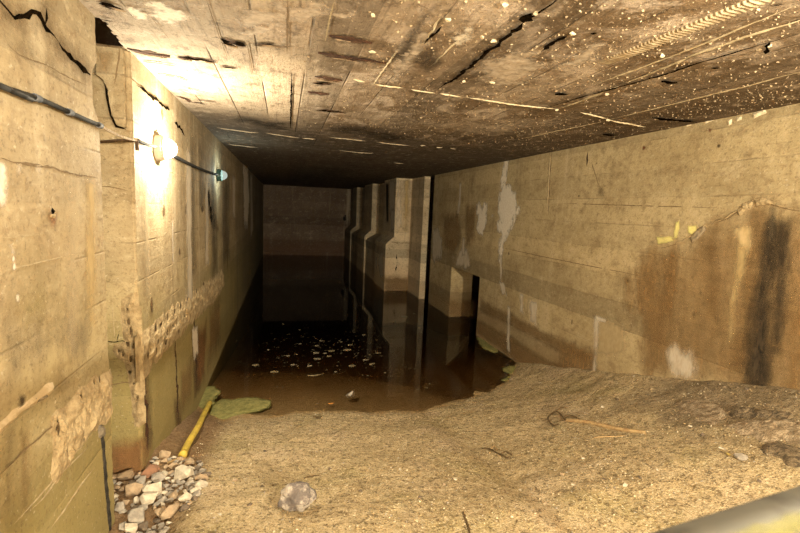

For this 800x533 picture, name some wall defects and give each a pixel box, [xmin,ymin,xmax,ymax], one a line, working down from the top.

crack [0,0,90,85]
crack [438,0,557,89]
crack [541,36,567,52]
crack [137,61,213,136]
leakage [432,161,520,294]
leakage [650,214,800,389]